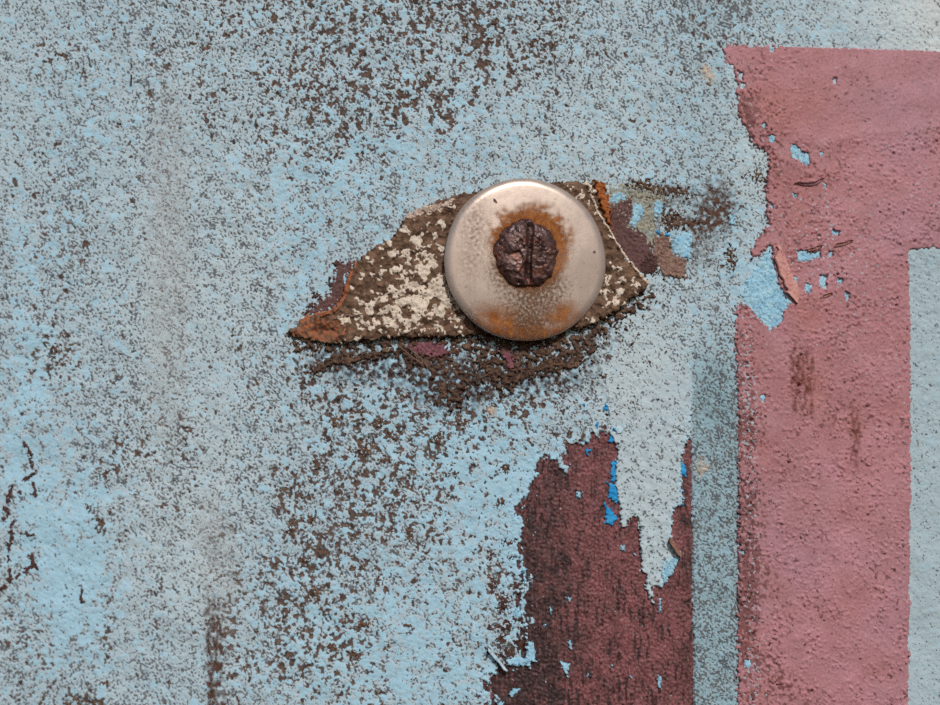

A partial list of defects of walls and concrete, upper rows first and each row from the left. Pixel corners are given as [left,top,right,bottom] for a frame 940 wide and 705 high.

spalling [723,64,745,89]
spalling [790,145,823,166]
peeling [792,178,826,198]
corrosion [592,179,614,233]
corrosion [491,204,572,291]
peeling [741,231,853,332]
corrosion [483,305,572,338]
peeling [282,171,739,612]
peeling [335,615,371,628]
peeling [484,568,537,671]
peeling [322,639,364,663]